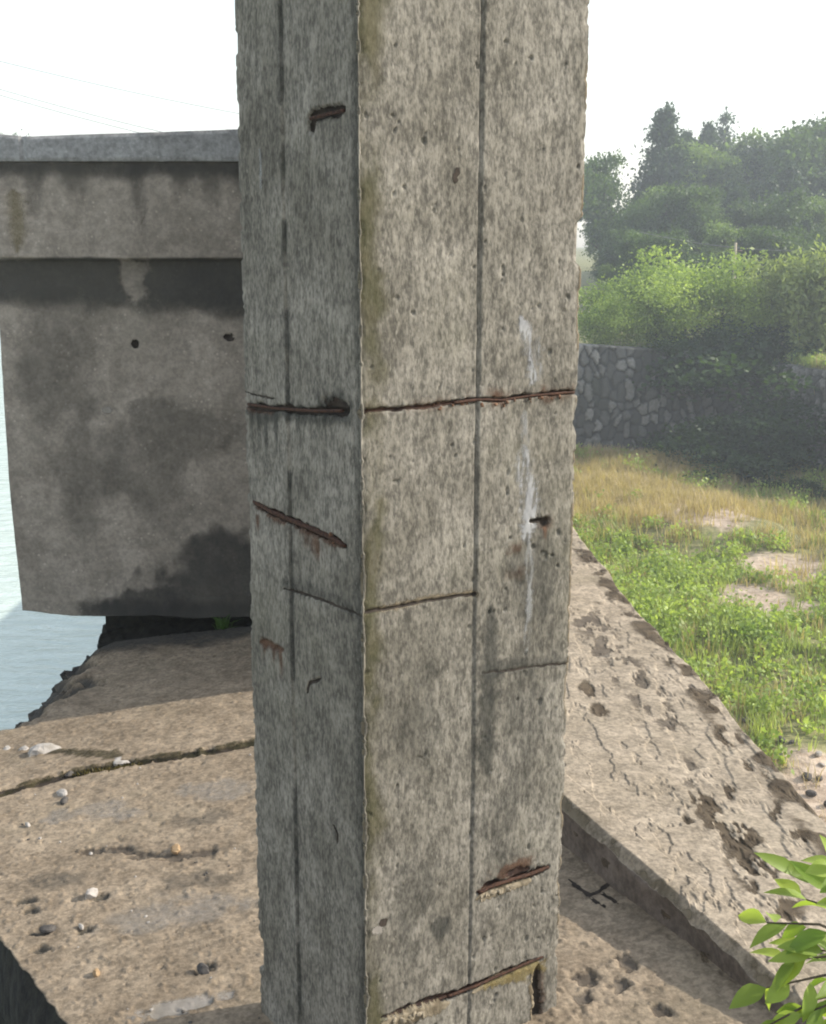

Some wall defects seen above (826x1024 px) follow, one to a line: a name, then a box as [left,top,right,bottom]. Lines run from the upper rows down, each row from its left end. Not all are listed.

leakage [0,162,239,176]
leakage [0,257,245,317]
leakage [519,316,541,384]
leakage [518,449,537,540]
leakage [85,530,252,618]
rust [261,638,285,666]
crack [0,739,255,797]
crack [568,879,619,908]